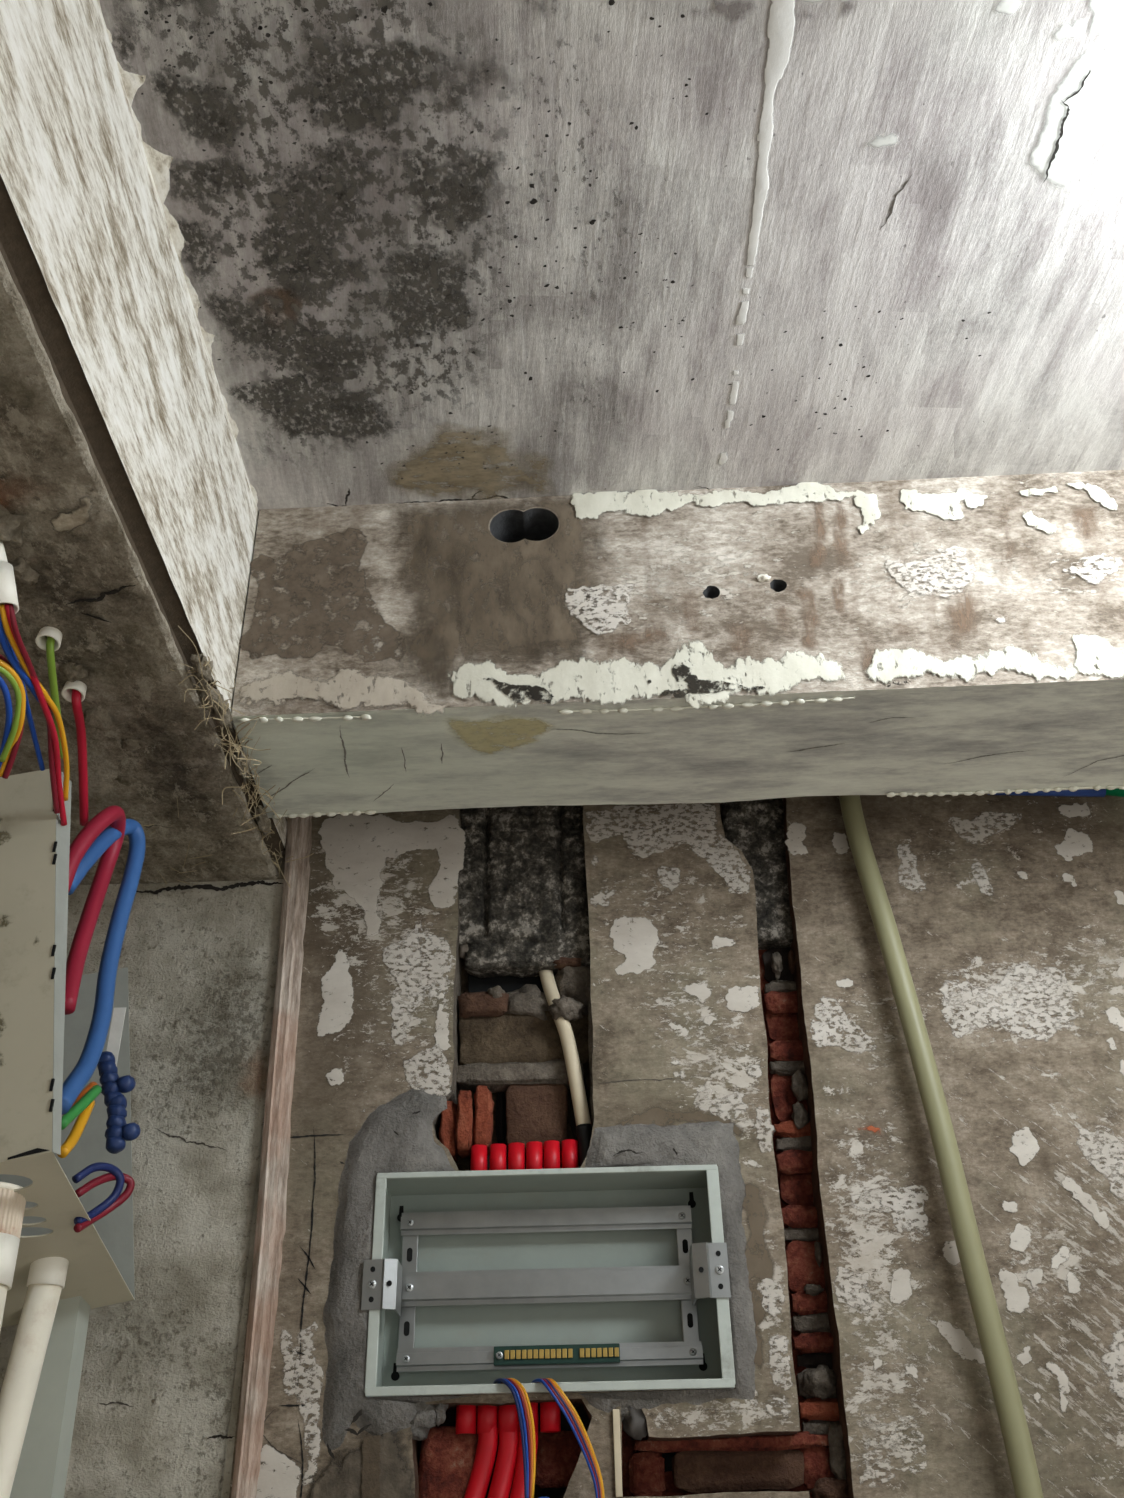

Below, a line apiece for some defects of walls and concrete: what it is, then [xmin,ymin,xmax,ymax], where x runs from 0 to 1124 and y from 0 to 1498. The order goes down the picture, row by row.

crack [1043,68,1091,183]
water stain [543,186,659,426]
water stain [114,0,606,696]
peeling [571,482,881,534]
peeling [885,546,976,597]
peeling [239,528,845,714]
peeling [867,634,1124,687]
crack [136,880,283,894]
peeling [317,813,589,1170]
peeling [810,978,876,1054]
peeling [939,963,1076,1041]
peeling [998,1246,1081,1313]